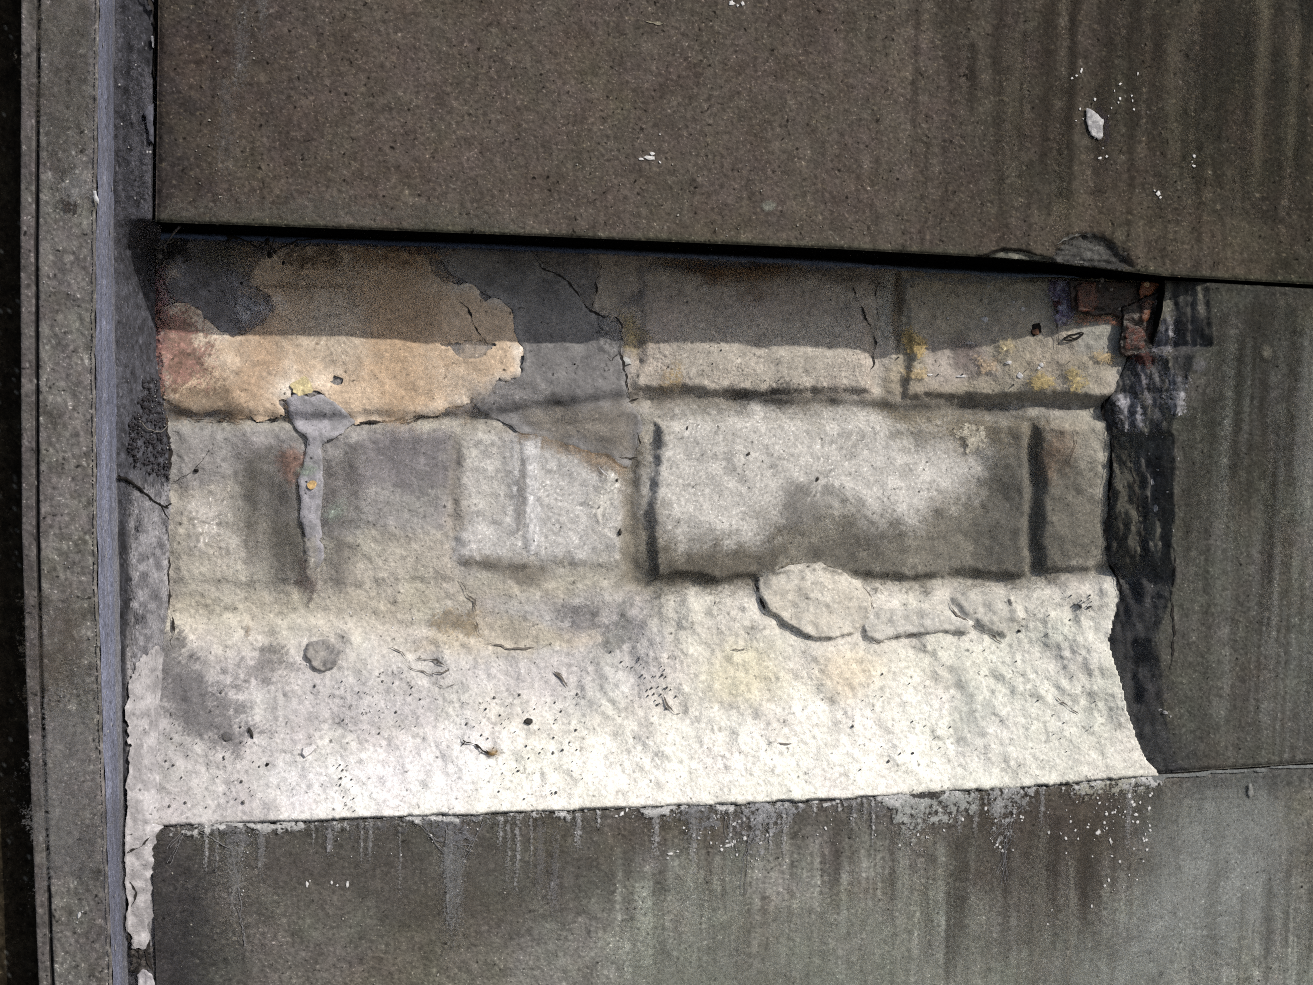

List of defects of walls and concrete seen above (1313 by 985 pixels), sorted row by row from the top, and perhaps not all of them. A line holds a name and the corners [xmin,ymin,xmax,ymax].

flaking render [129,244,524,470]
crack [533,255,641,468]
crack [850,271,879,380]
spalling [977,231,1159,350]
damp [1113,309,1205,437]
spalling [758,557,1021,657]
spalling [1108,430,1175,771]
spalling [463,690,583,780]
damp [170,821,349,939]
damp [366,812,515,923]
damp [631,776,1162,871]
damp [1064,800,1277,985]